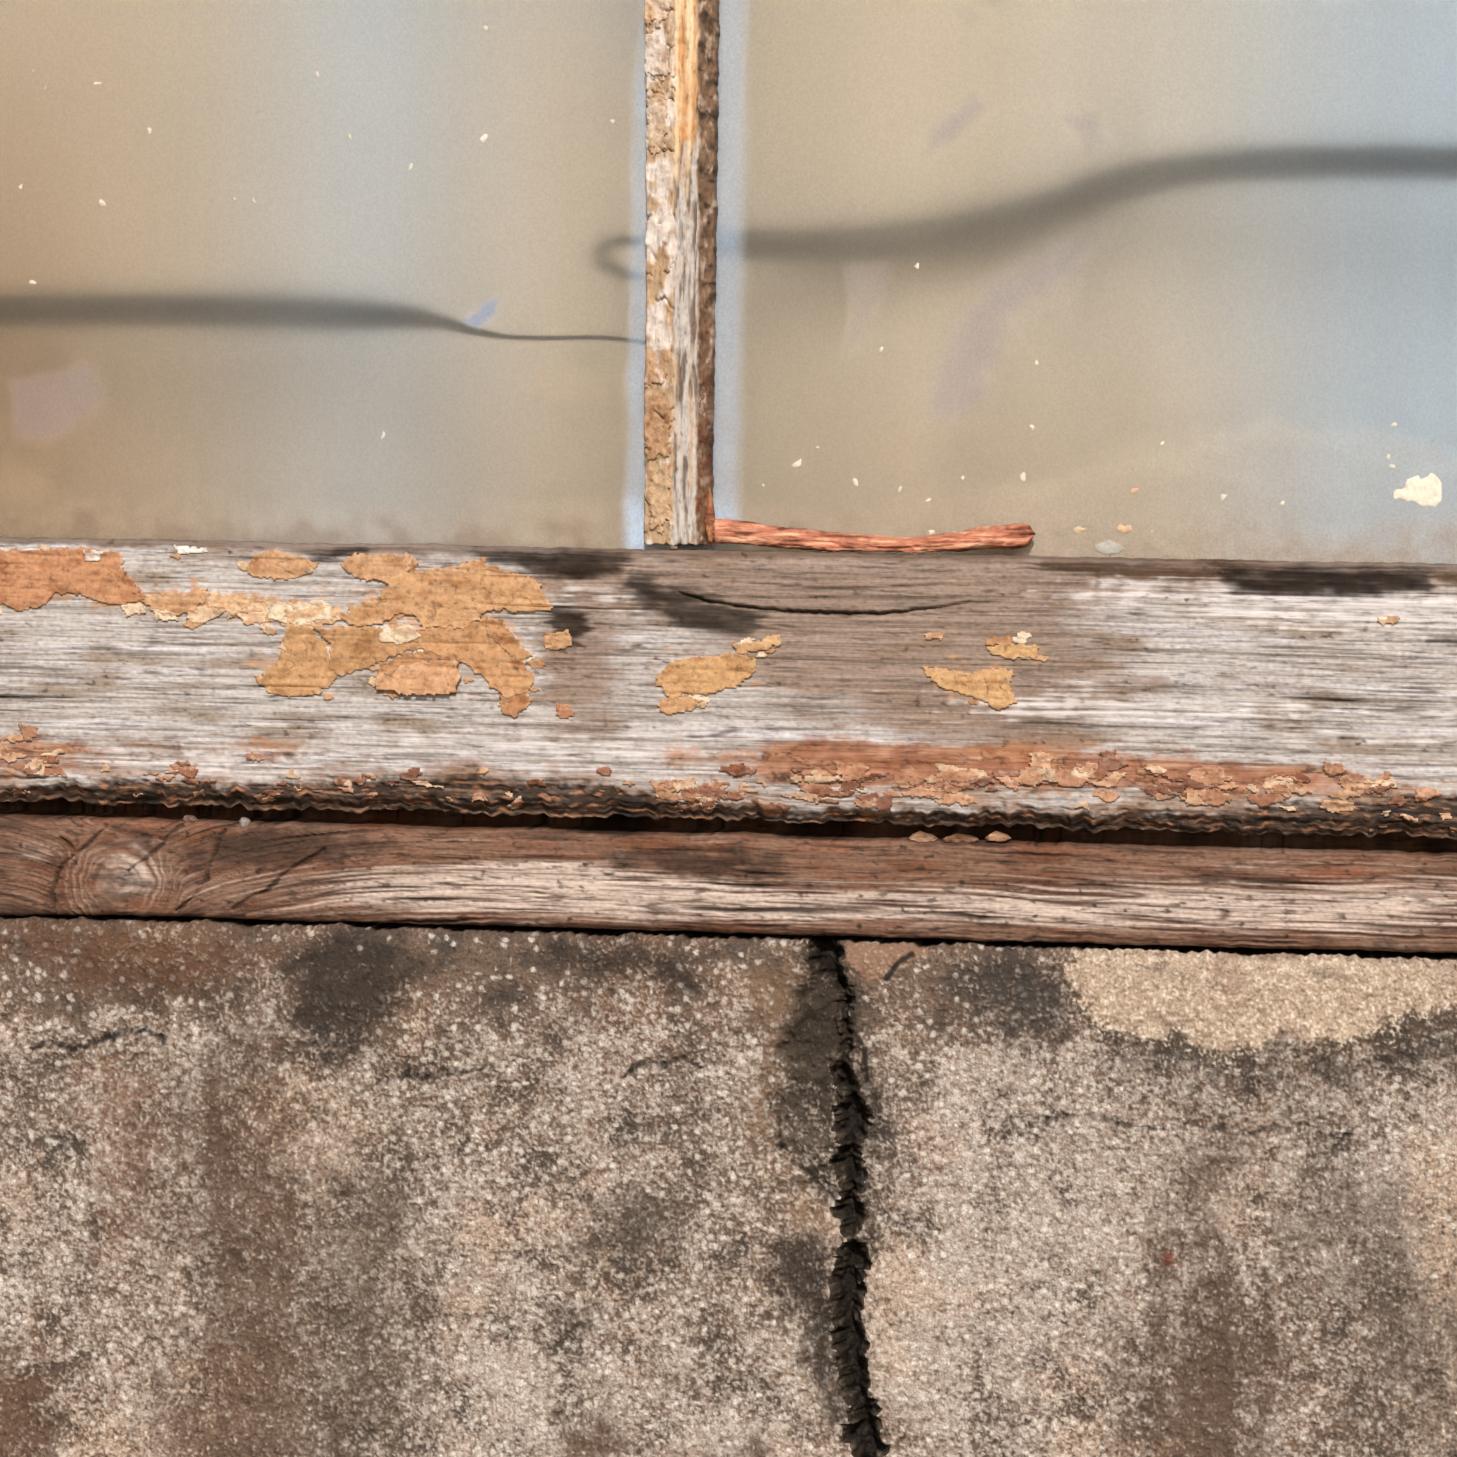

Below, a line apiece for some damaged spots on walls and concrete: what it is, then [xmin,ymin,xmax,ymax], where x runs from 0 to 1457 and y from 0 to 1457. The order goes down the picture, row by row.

peeling [0,544,573,718]
peeling [1378,616,1400,626]
peeling [656,635,781,715]
peeling [922,631,1049,711]
peeling [0,723,67,795]
peeling [143,760,217,797]
peeling [246,752,265,761]
peeling [254,767,453,803]
peeling [472,768,489,802]
peeling [505,779,546,809]
peeling [596,749,1457,832]
crack [775,937,890,1457]